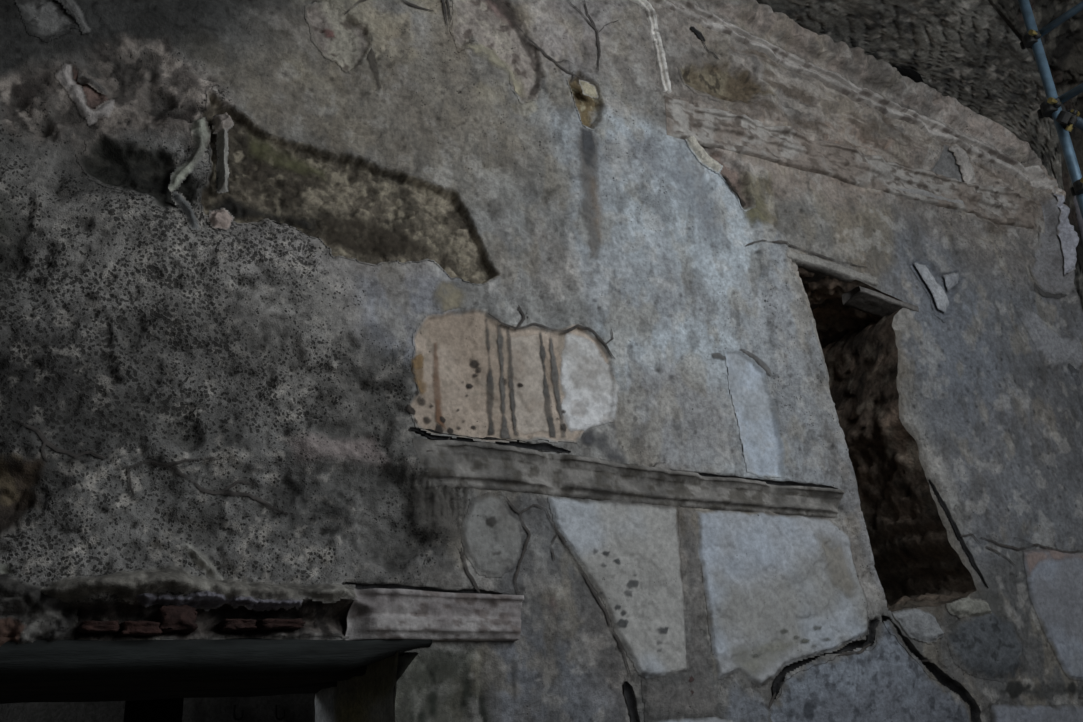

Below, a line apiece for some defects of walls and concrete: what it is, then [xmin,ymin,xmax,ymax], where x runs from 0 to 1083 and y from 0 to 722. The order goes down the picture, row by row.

crack [404,0,452,32]
crack [518,0,618,81]
peeling [55,62,116,127]
damp [168,112,234,231]
spalling [197,89,502,286]
damp [580,128,599,224]
spalling [908,257,968,322]
spalling [0,452,54,540]
crack [107,457,288,514]
crack [928,479,1080,588]
crack [345,491,640,722]
crack [768,615,982,722]